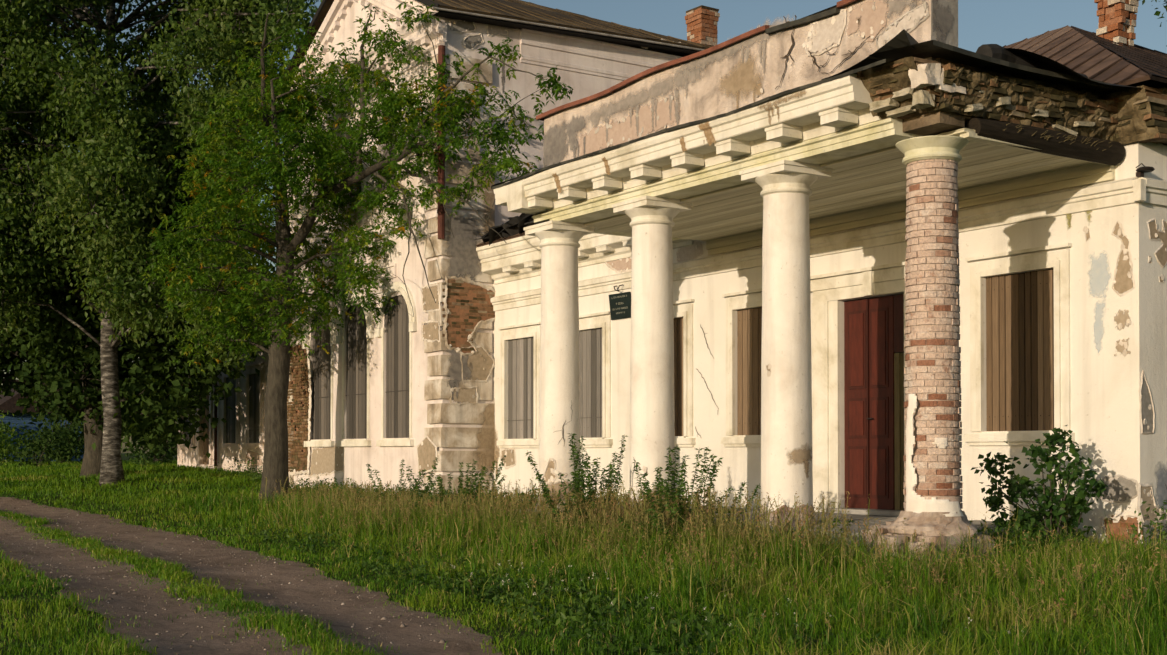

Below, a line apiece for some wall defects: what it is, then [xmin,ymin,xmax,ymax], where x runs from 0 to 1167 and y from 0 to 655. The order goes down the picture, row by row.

crack [775,15,870,89]
peeling [802,0,929,56]
peeling [578,96,680,156]
spalling [860,56,1167,146]
peeling [1147,218,1167,283]
peeling [1111,220,1135,357]
spalling [421,275,495,406]
spalling [1139,370,1155,435]
spalling [1100,483,1167,549]